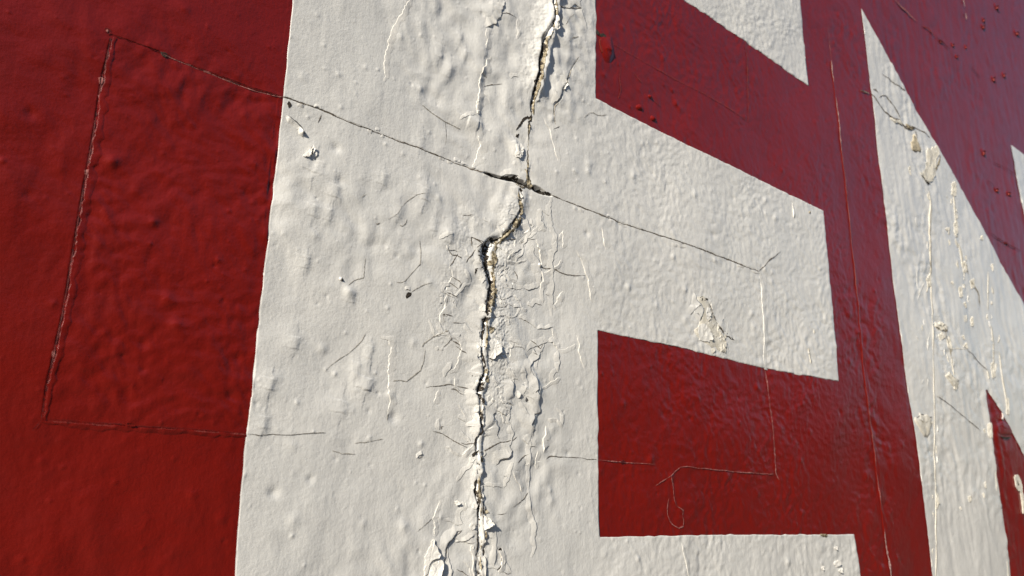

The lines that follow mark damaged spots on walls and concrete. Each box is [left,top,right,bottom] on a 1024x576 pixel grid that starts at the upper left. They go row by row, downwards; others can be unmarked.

crack [104,0,775,576]
peeling [417,501,507,576]
peeling [478,197,596,558]
peeling [908,133,1010,576]